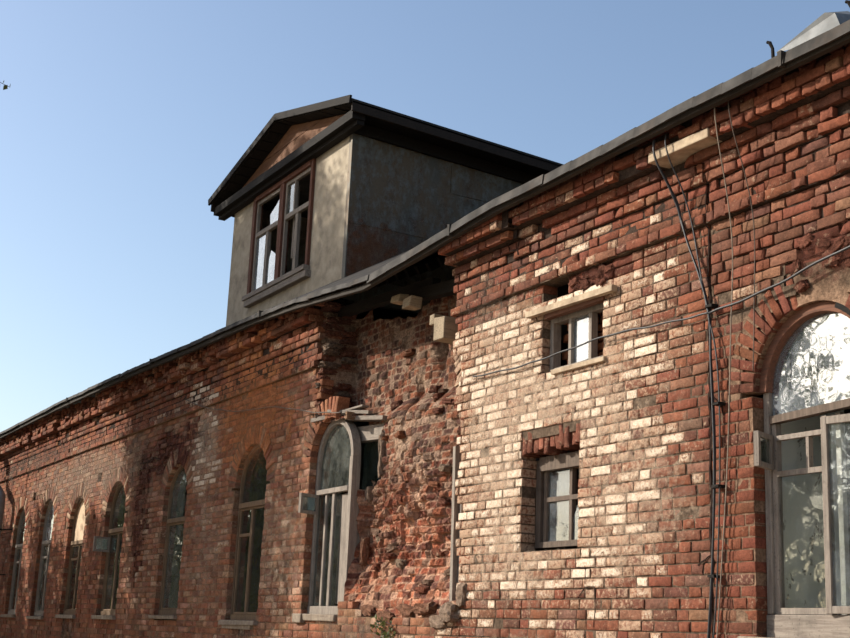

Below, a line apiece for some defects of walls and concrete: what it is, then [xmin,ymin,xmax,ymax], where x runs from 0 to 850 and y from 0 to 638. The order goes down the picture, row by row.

spalling [310,258,686,638]